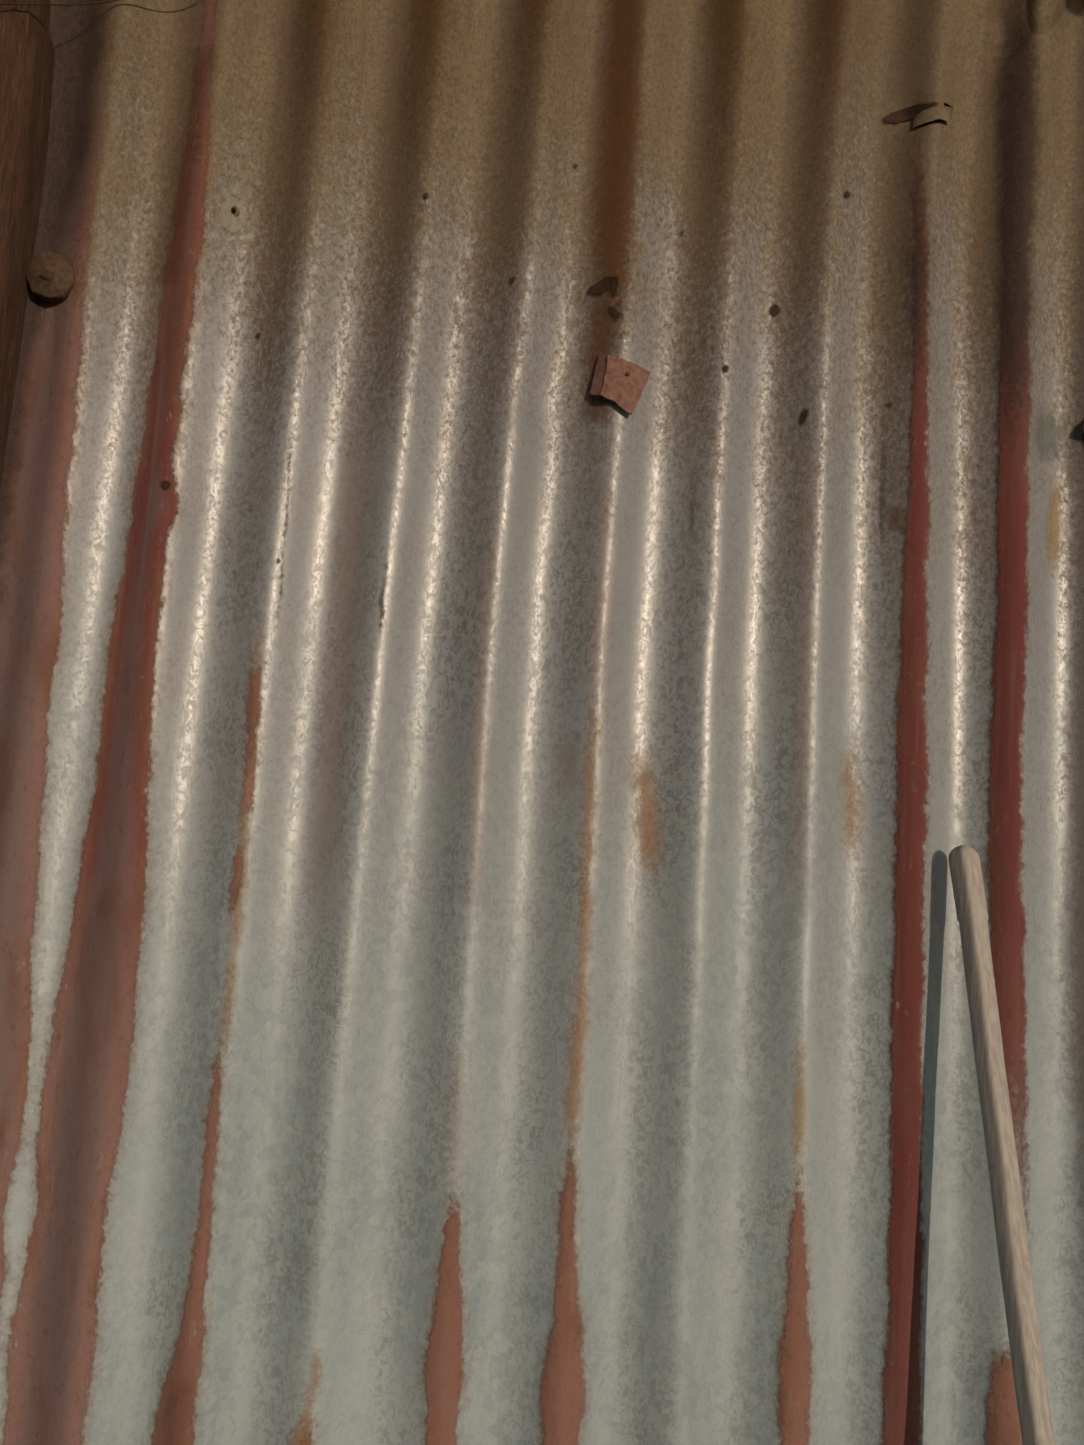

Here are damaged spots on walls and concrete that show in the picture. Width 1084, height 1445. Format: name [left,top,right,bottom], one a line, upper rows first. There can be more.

rust [587,0,639,412]
rust [0,0,221,1445]
rust [424,1199,464,1445]
rust [539,735,596,1445]
rust [777,1183,813,1445]
rust [882,161,931,1445]
rust [985,1350,1022,1445]
rust [986,307,1032,1179]